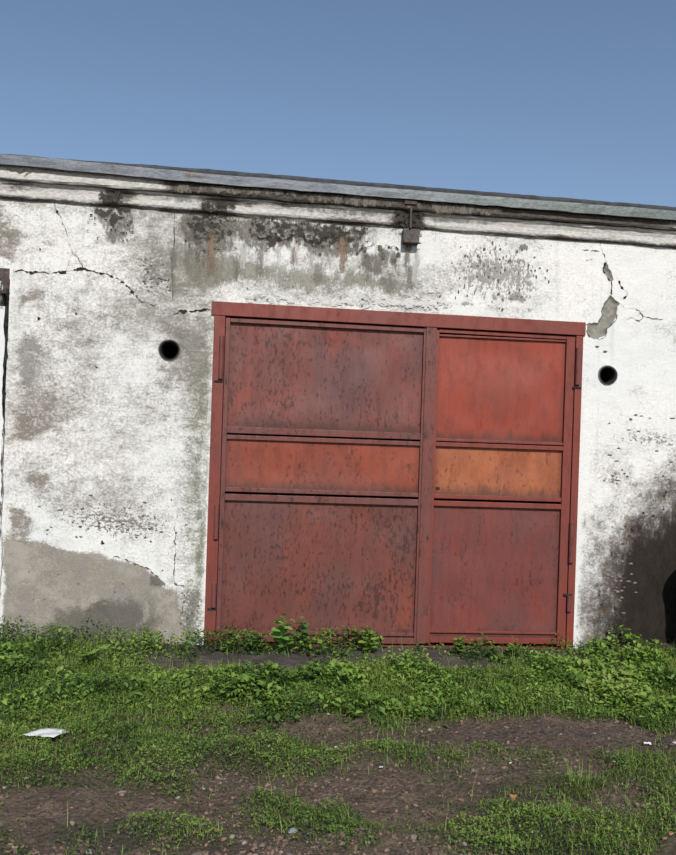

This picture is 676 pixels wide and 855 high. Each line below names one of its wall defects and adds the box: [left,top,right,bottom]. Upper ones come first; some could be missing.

leakage [87,190,135,242]
leakage [165,185,501,293]
flaking render [586,295,620,352]
flaking render [603,261,613,281]
crack [611,281,662,321]
crack [0,202,210,533]
peeling [603,414,673,486]
leakage [2,508,188,647]